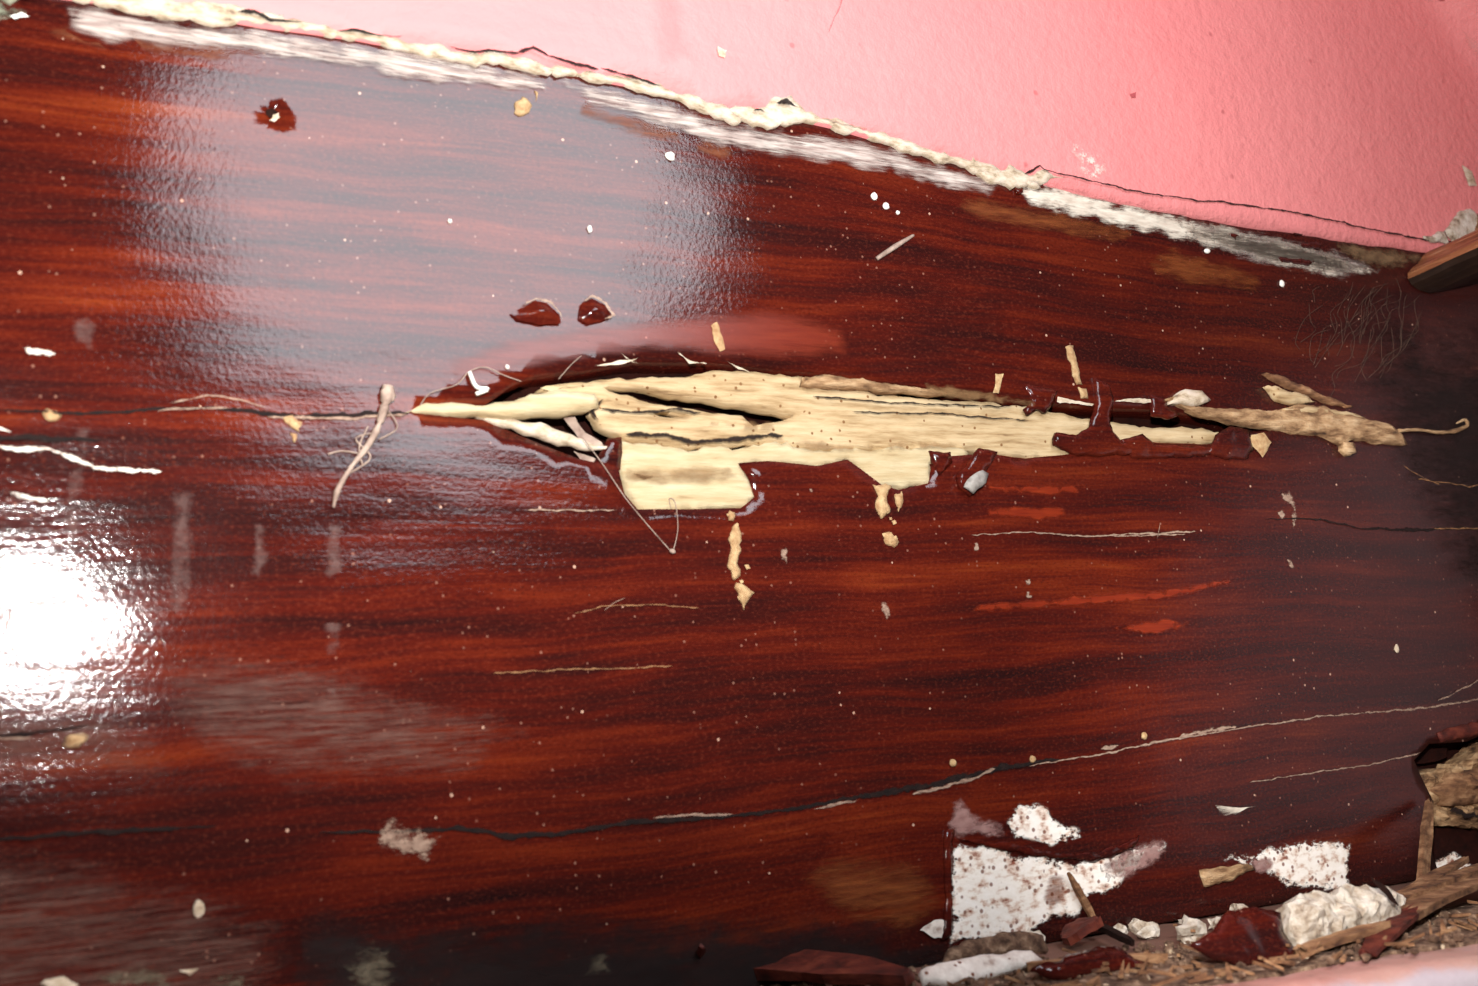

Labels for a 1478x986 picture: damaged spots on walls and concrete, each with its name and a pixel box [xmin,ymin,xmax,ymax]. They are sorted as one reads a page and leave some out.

peeling [72,0,1063,194]
peeling [1278,233,1323,266]
spalling [799,374,946,398]
peeling [993,374,1004,393]
crack [495,665,669,674]
peeling [1437,722,1478,742]
crack [319,680,1478,841]
peeling [921,803,1165,943]
peeling [1199,841,1350,890]
peeling [1189,907,1296,966]
peeling [1029,946,1152,981]